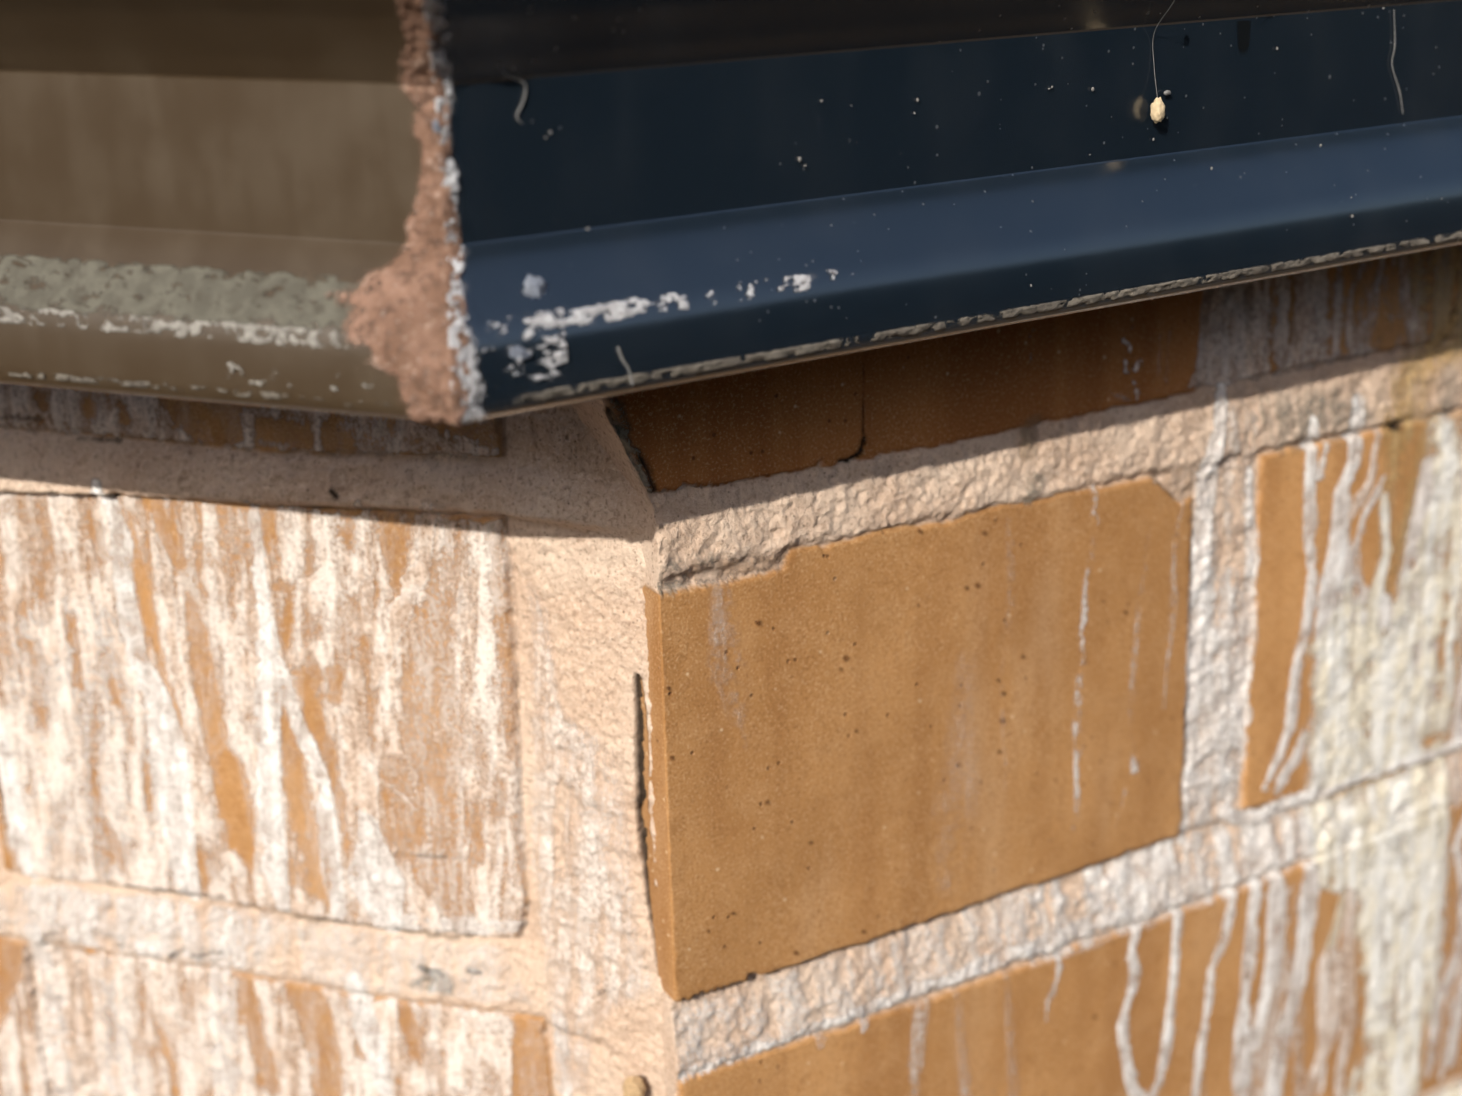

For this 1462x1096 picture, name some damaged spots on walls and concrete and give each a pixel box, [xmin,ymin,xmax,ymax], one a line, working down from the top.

peeling [227,362,265,387]
crack [838,371,865,463]
water stain [0,479,649,1096]
crack [635,673,655,927]
water stain [678,247,1462,1096]